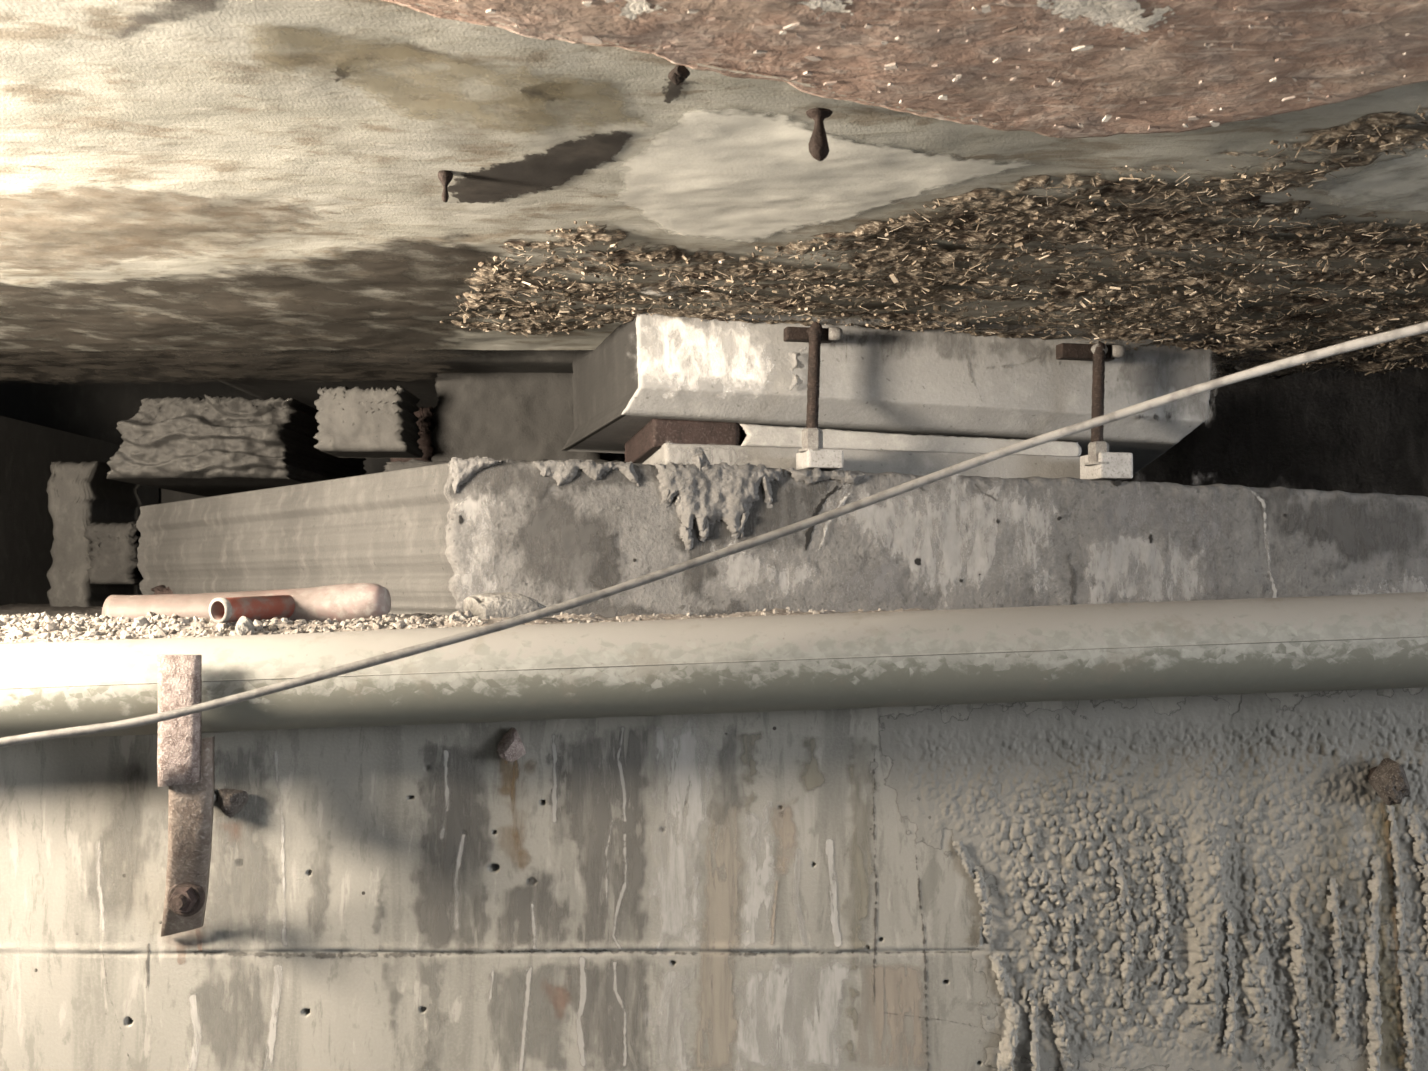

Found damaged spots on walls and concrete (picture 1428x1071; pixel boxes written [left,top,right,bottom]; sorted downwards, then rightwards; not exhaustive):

peeling [486,9,643,47]
peeling [583,0,667,20]
peeling [780,22,802,38]
peeling [983,0,1176,81]
spalling [520,83,564,101]
spalling [662,81,689,103]
peeling [697,46,1013,127]
peeling [1269,57,1310,101]
peeling [1183,107,1223,127]
water stain [615,109,1029,243]
crack [805,486,850,551]
corrosion [1378,802,1402,1066]